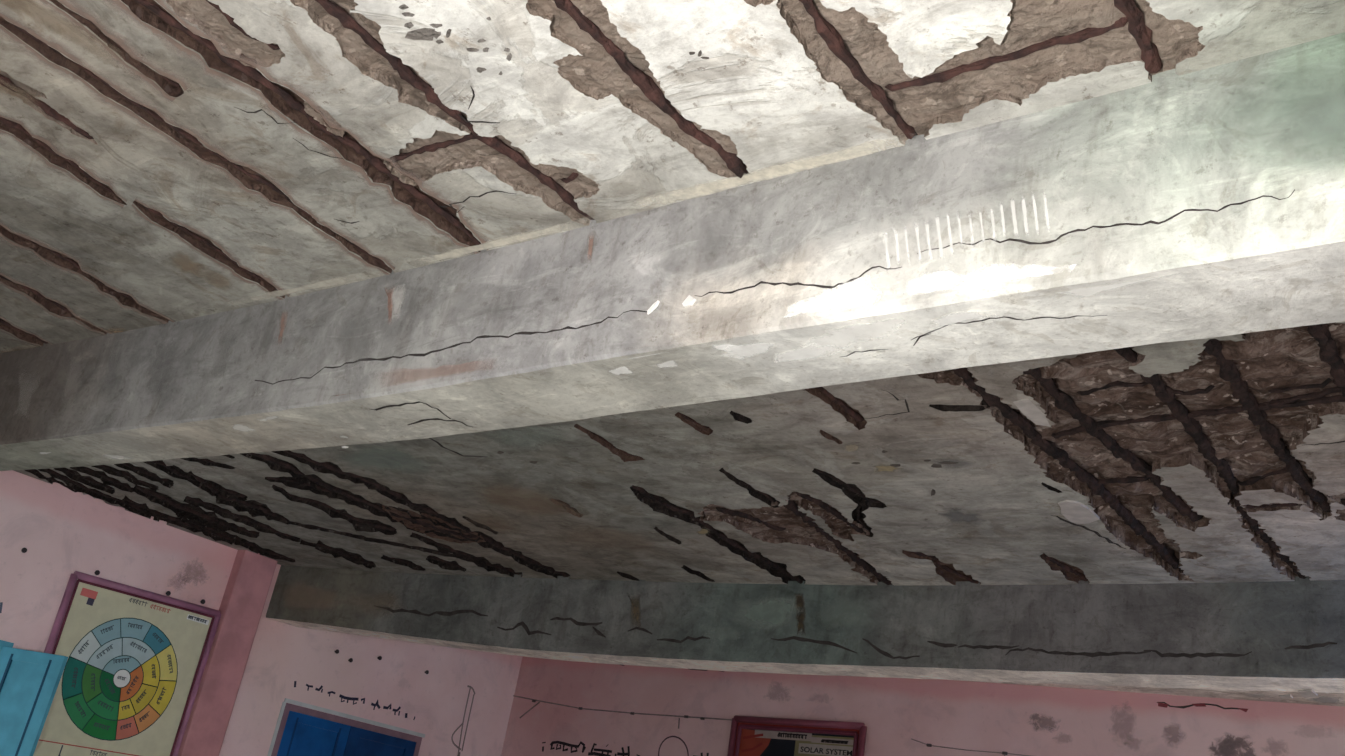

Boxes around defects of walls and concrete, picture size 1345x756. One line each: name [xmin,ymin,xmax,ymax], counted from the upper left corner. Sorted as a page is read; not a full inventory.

spalling [0,0,395,300]
spalling [109,0,600,254]
spalling [526,0,750,183]
spalling [744,0,1205,145]
crack [695,189,1295,297]
crack [255,307,658,385]
crack [841,315,1107,357]
spalling [916,322,1345,583]
crack [374,605,724,672]
crack [771,636,1252,659]
leakage [1030,714,1056,730]
leakage [1210,734,1255,756]